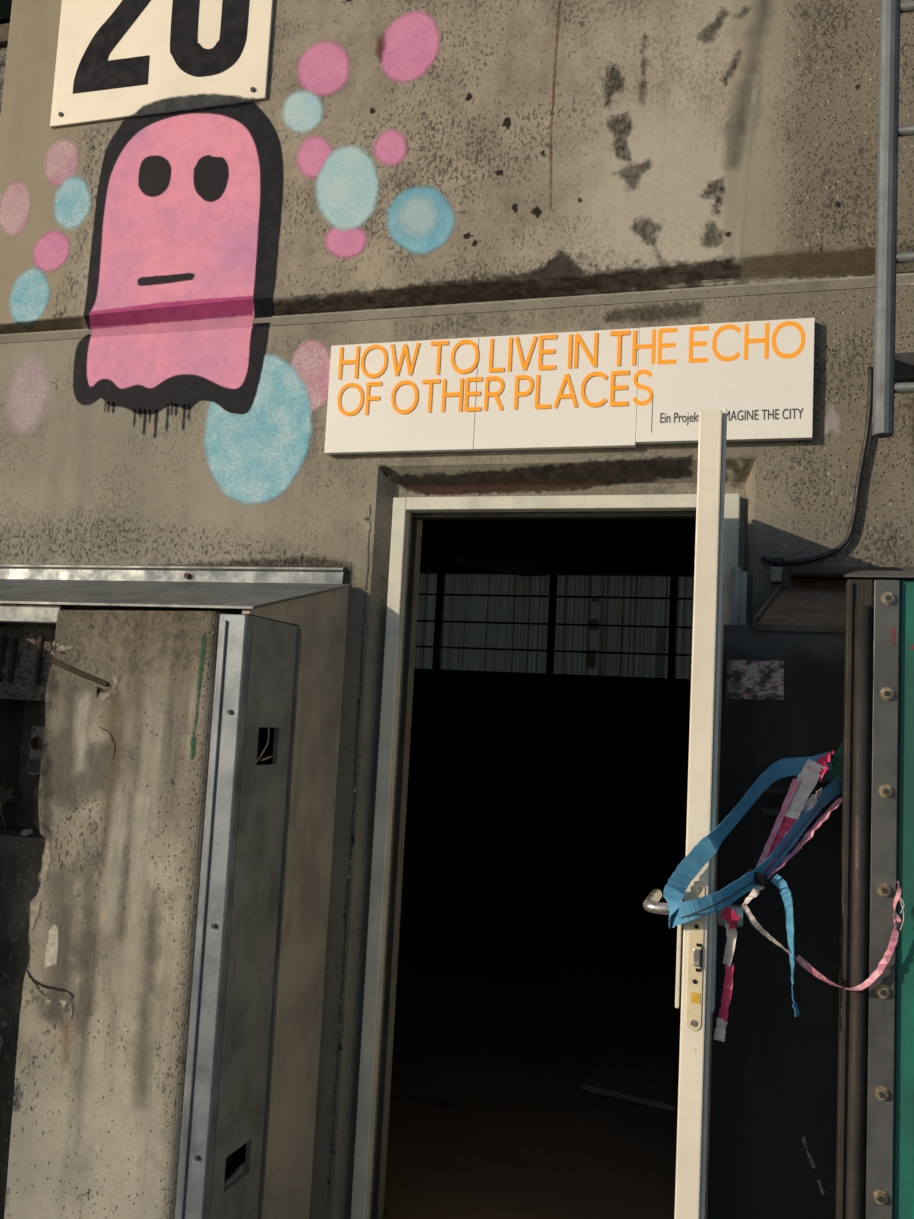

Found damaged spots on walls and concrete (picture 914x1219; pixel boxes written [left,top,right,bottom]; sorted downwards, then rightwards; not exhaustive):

water stain [702,7,748,42]
water stain [605,66,649,188]
water stain [272,180,875,316]
water stain [606,303,703,321]
water stain [49,692,109,806]
water stain [107,790,154,960]
water stain [48,857,92,1019]